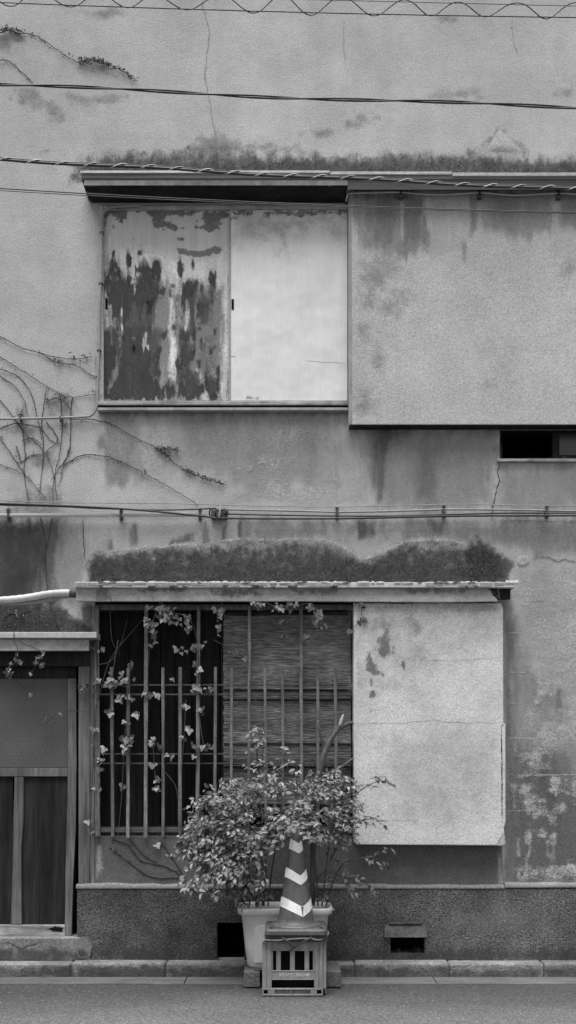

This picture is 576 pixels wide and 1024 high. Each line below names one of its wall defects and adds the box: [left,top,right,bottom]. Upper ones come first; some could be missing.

crack [202,1,218,152]
peeling [104,211,229,401]
water stain [99,412,495,509]
water stain [341,466,576,553]
crack [491,465,573,522]
water stain [503,611,576,882]